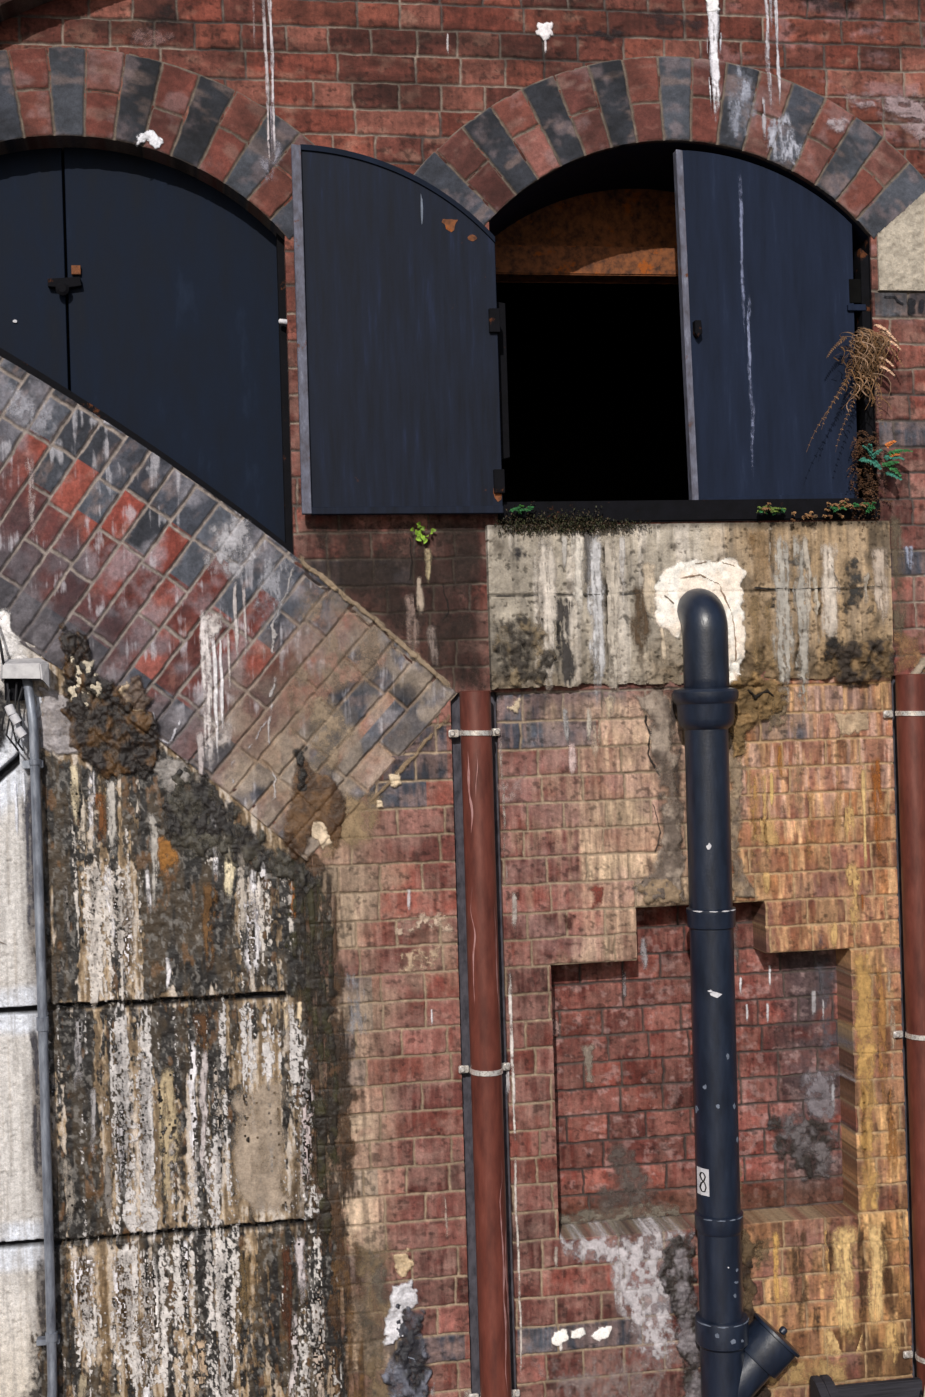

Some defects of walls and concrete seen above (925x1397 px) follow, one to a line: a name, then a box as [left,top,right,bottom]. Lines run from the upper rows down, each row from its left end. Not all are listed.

water stain [253,0,280,172]
water stain [706,0,800,160]
water stain [851,95,925,138]
water stain [7,390,52,432]
water stain [515,530,666,752]
water stain [563,709,576,773]
water stain [23,520,366,1397]
water stain [401,947,439,972]
water stain [395,890,452,935]
water stain [640,939,648,967]
spalling [382,1249,432,1397]
water stain [554,1218,685,1397]